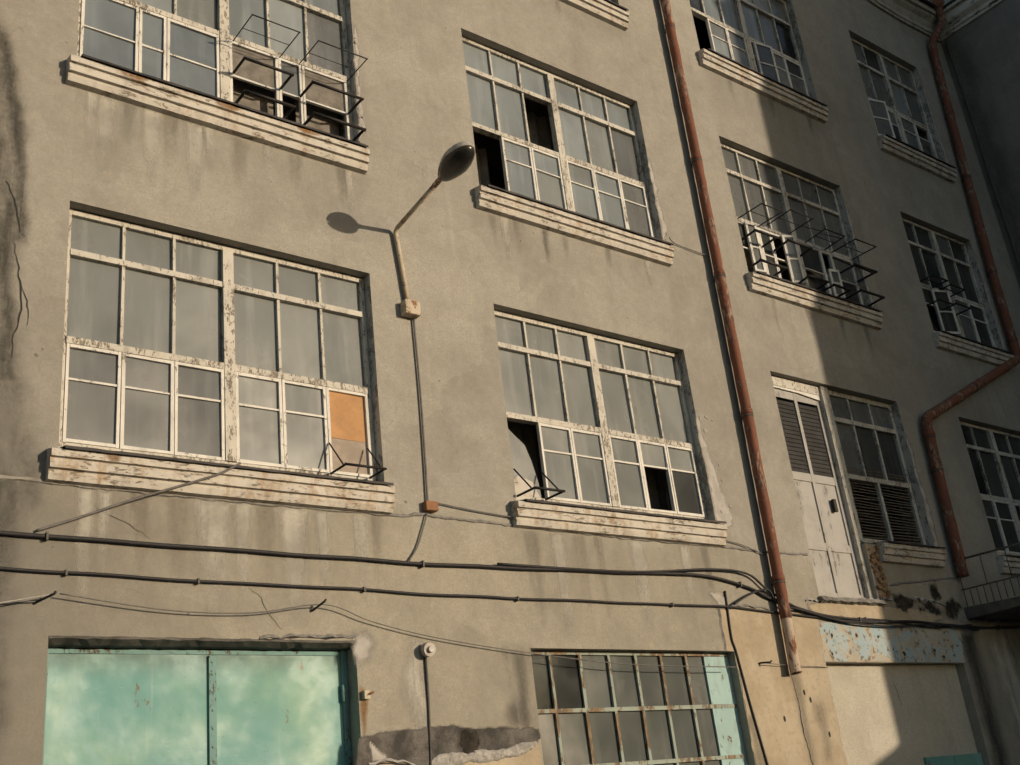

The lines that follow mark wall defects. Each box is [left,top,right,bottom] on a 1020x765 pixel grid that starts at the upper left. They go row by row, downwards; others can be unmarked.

crack [6,181,29,353]
flaking render [710,544,968,765]
flaking render [356,725,543,765]